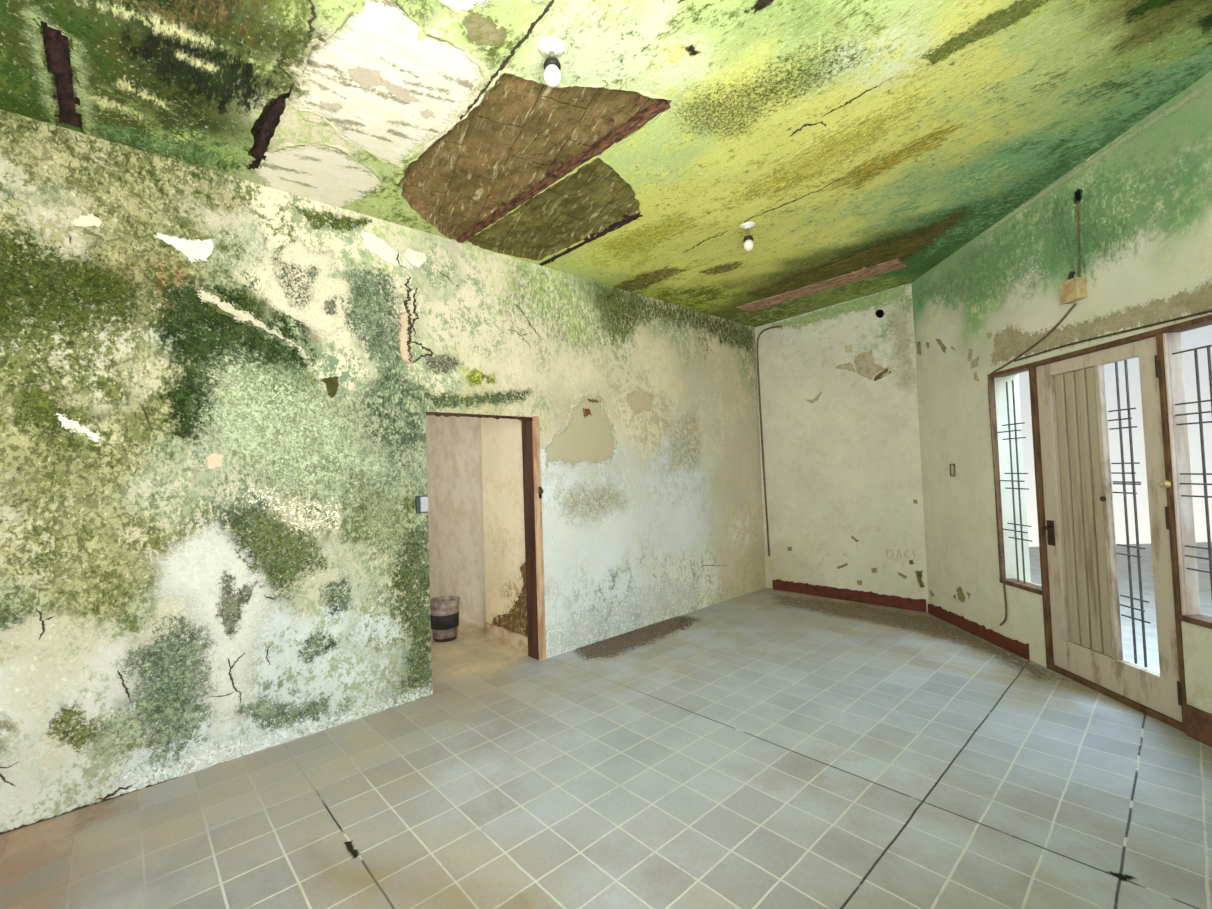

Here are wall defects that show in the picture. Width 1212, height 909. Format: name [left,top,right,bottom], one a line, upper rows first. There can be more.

spalling [28,16,89,135]
water stain [21,0,278,173]
peeling [242,0,673,241]
water stain [744,0,774,14]
water stain [922,0,1051,65]
water stain [1126,0,1174,22]
water stain [289,203,372,232]
water stain [746,81,1212,365]
crack [396,253,460,365]
water stain [505,262,753,353]
peeling [542,394,618,467]
water stain [0,227,433,794]